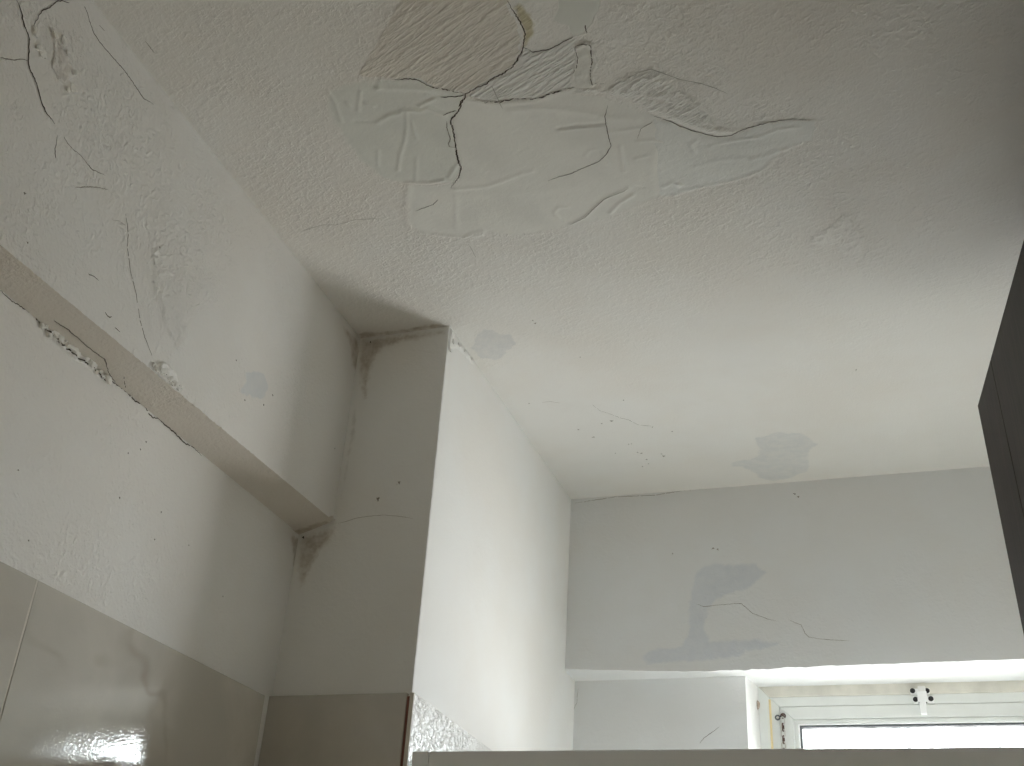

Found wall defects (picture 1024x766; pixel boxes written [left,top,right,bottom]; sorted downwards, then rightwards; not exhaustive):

crack [0,0,154,189]
crack [394,2,596,211]
crack [551,114,611,180]
crack [114,218,151,352]
spalling [39,322,116,385]
leakage [288,319,448,596]
leakage [726,429,823,483]
leakage [637,558,786,665]